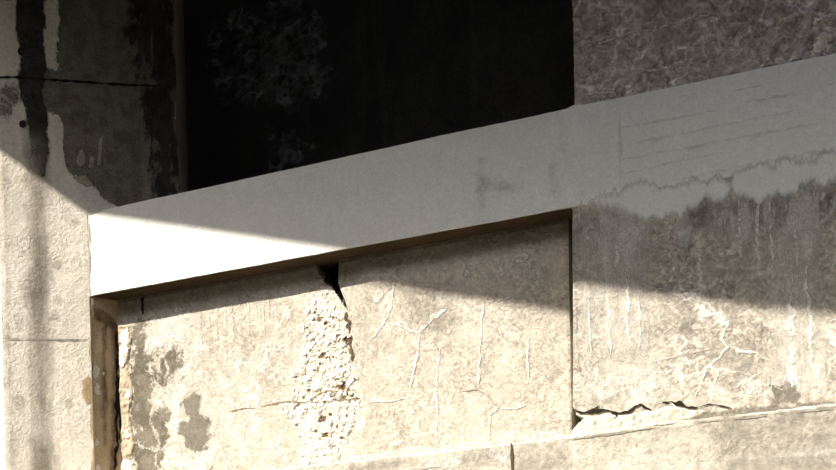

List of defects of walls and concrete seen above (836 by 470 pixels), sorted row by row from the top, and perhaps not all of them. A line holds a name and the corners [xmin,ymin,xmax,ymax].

damp [0,0,179,417]
damp [34,445,48,470]
crack [3,335,90,343]
rust [82,374,94,470]
rust [95,309,117,360]
rust [103,367,118,470]
crack [113,322,121,470]
damp [135,301,292,470]
spalling [263,276,371,467]
crack [232,280,446,444]
crack [461,297,525,440]
damp [575,192,836,419]